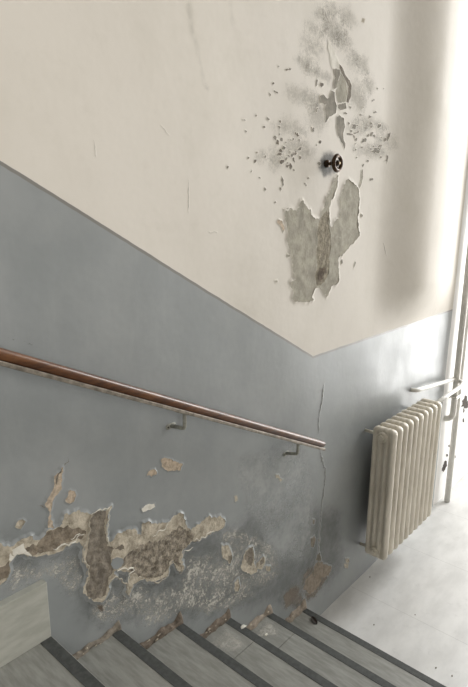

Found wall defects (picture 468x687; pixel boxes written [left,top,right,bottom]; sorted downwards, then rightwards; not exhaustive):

peeling [318,39,352,151]
peeling [274,171,364,307]
crack [317,383,327,554]
spalling [0,460,226,605]
peeling [139,611,184,650]
leakage [93,502,309,625]
peeling [200,608,231,639]
spalling [219,542,271,594]